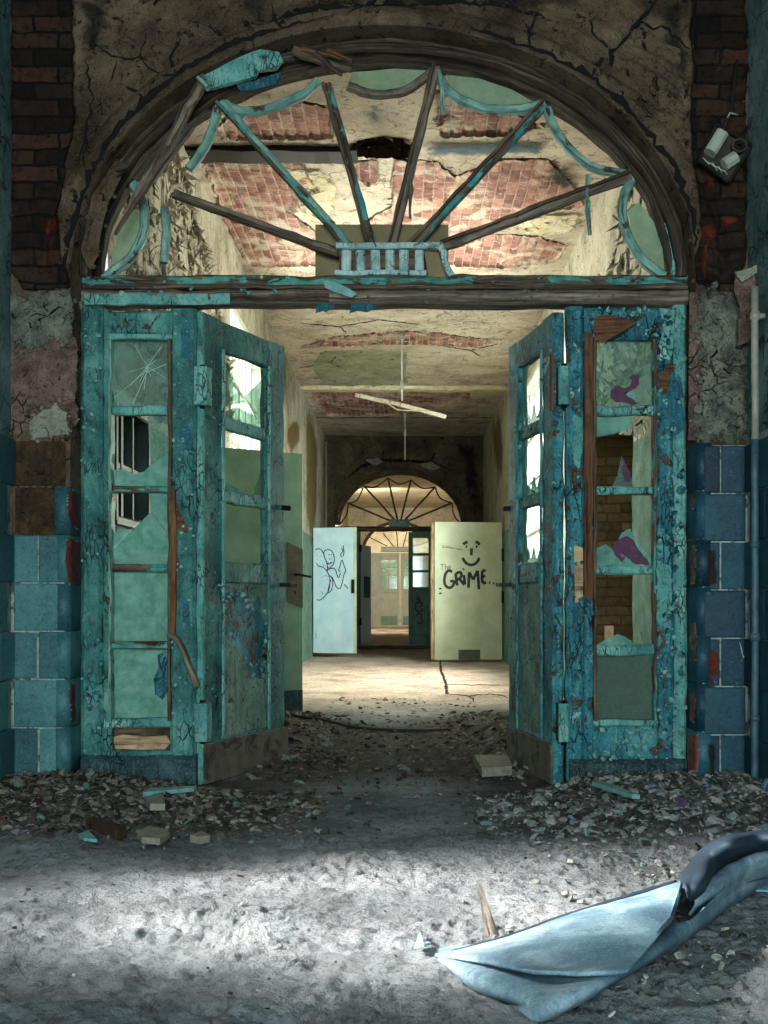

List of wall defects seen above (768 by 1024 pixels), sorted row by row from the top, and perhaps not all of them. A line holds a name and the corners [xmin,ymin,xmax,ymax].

spalling [216,101,342,142]
crack [62,0,698,276]
spalling [434,90,546,139]
spalling [127,152,336,294]
spalling [354,158,582,284]
spalling [566,0,757,455]
spalling [10,0,101,585]
peeling [221,353,241,421]
peeling [301,330,506,417]
crack [345,451,448,480]
crack [439,660,508,701]
peeling [566,468,717,774]